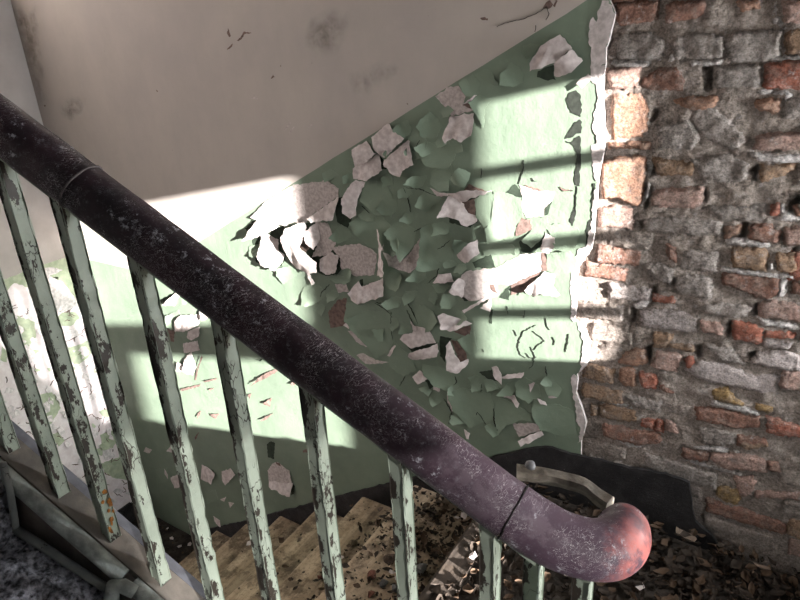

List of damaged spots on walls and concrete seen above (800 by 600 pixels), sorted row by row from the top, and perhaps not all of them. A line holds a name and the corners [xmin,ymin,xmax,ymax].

peeling [242,0,616,447]
peeling [160,292,217,391]
crack [507,307,569,376]
peeling [201,465,235,507]
peeling [267,442,295,497]